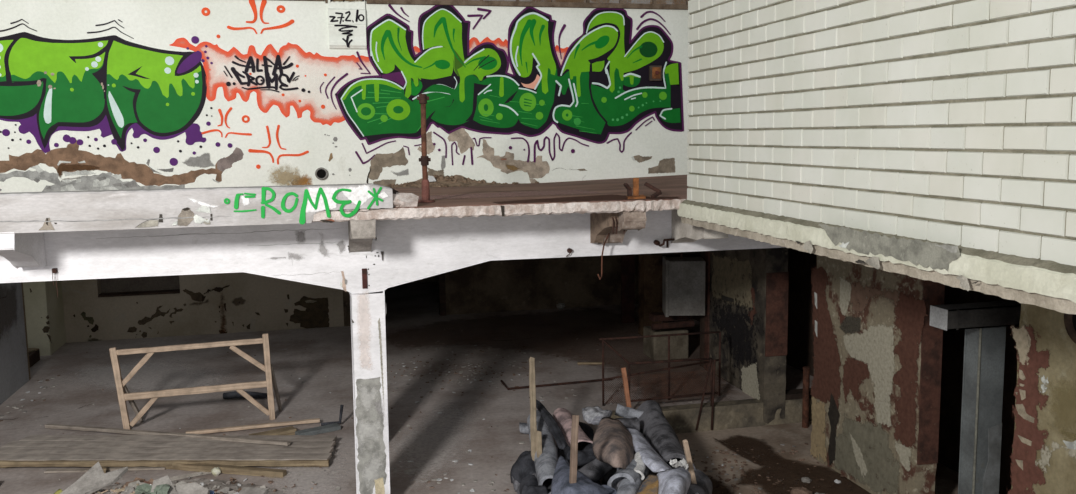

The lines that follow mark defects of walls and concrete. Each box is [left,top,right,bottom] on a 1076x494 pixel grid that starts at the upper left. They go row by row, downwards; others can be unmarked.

spalling [0,137,244,192]
spalling [366,132,445,186]
spalling [448,128,550,183]
spalling [631,155,675,174]
peeling [819,224,978,291]
flaking render [73,312,99,341]
flaking render [127,285,230,338]
flaking render [284,294,330,329]
flaking render [810,266,927,462]
peeling [355,318,387,494]
flaking render [982,325,1076,494]